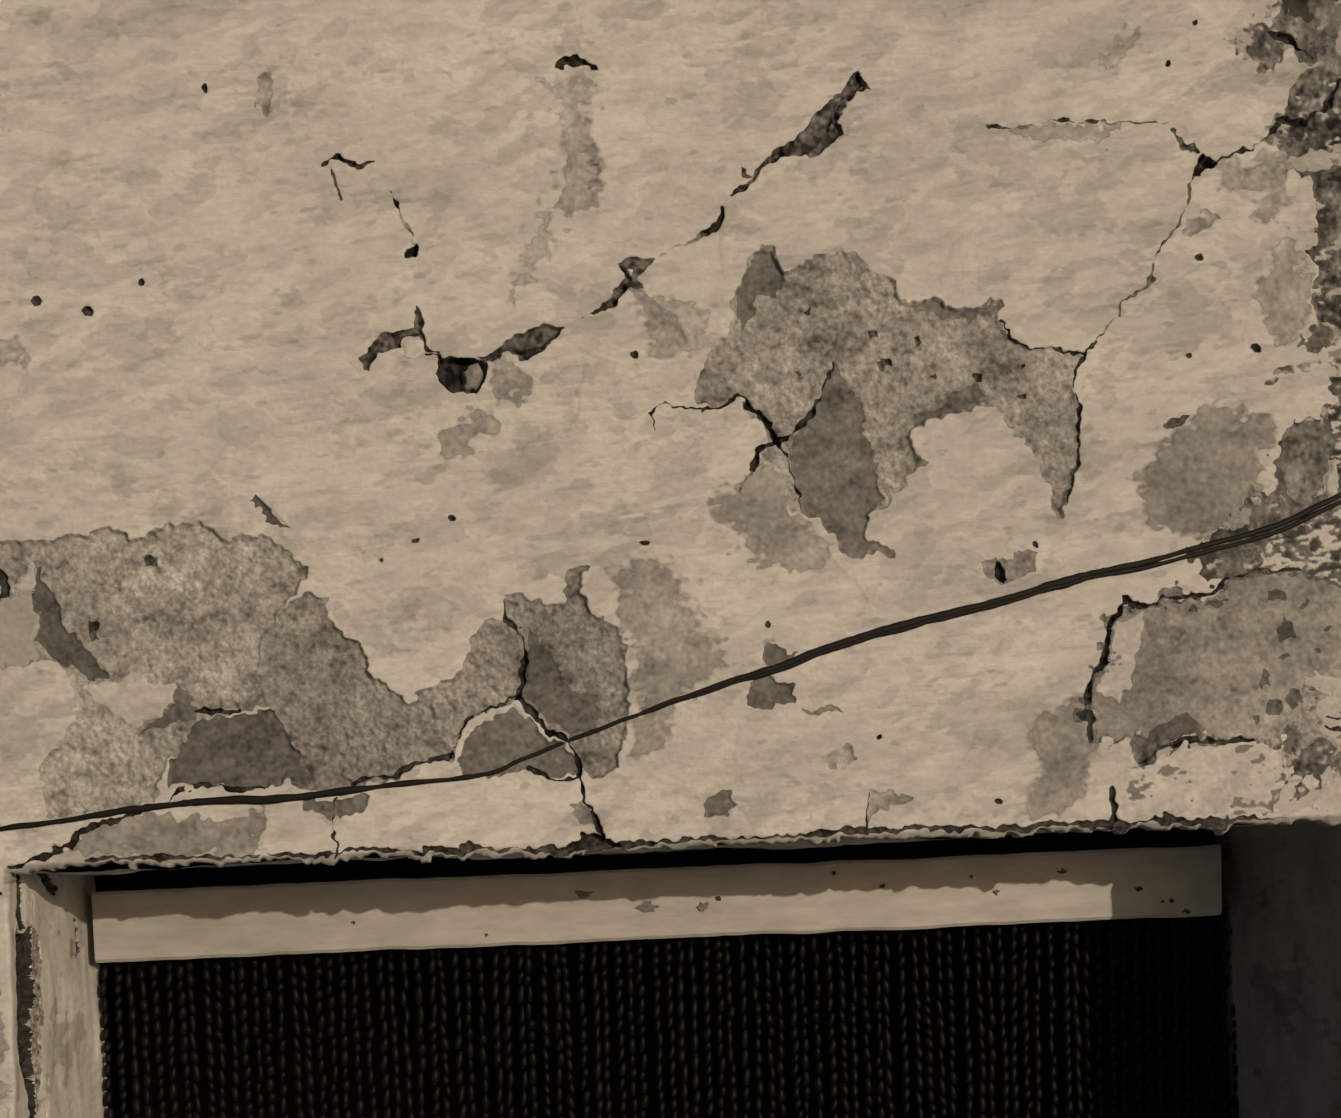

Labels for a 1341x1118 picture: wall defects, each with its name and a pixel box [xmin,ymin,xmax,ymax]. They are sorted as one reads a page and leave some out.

crack [321,153,375,201]
crack [390,191,419,258]
crack [581,71,871,319]
crack [649,362,834,510]
spalling [694,244,1083,573]
crack [986,117,1281,505]
spalling [1010,0,1341,820]
spalling [0,494,728,857]
crack [1076,567,1302,743]
crack [0,600,1284,1118]
peeling [703,790,737,818]
peeling [0,1013,9,1062]